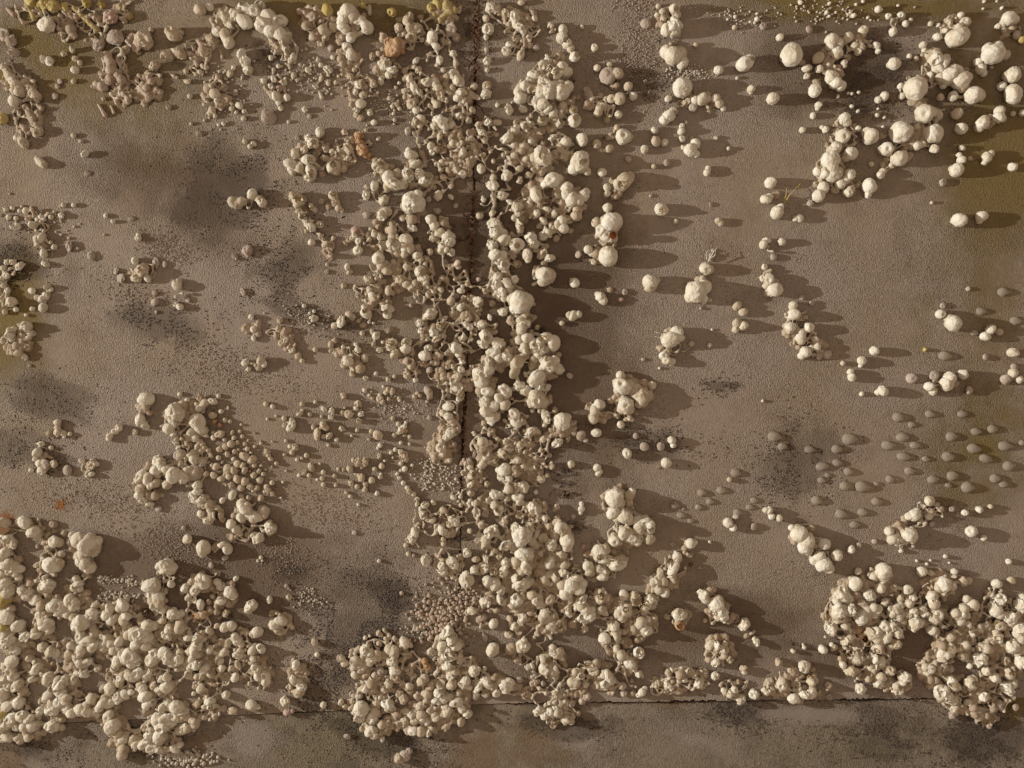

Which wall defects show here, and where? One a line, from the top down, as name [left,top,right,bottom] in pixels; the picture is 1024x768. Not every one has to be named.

leakage [753,0,1024,245]
leakage [0,0,731,768]
crack [457,0,484,594]
crack [590,697,780,705]
leakage [651,562,1024,768]
crack [837,695,935,703]